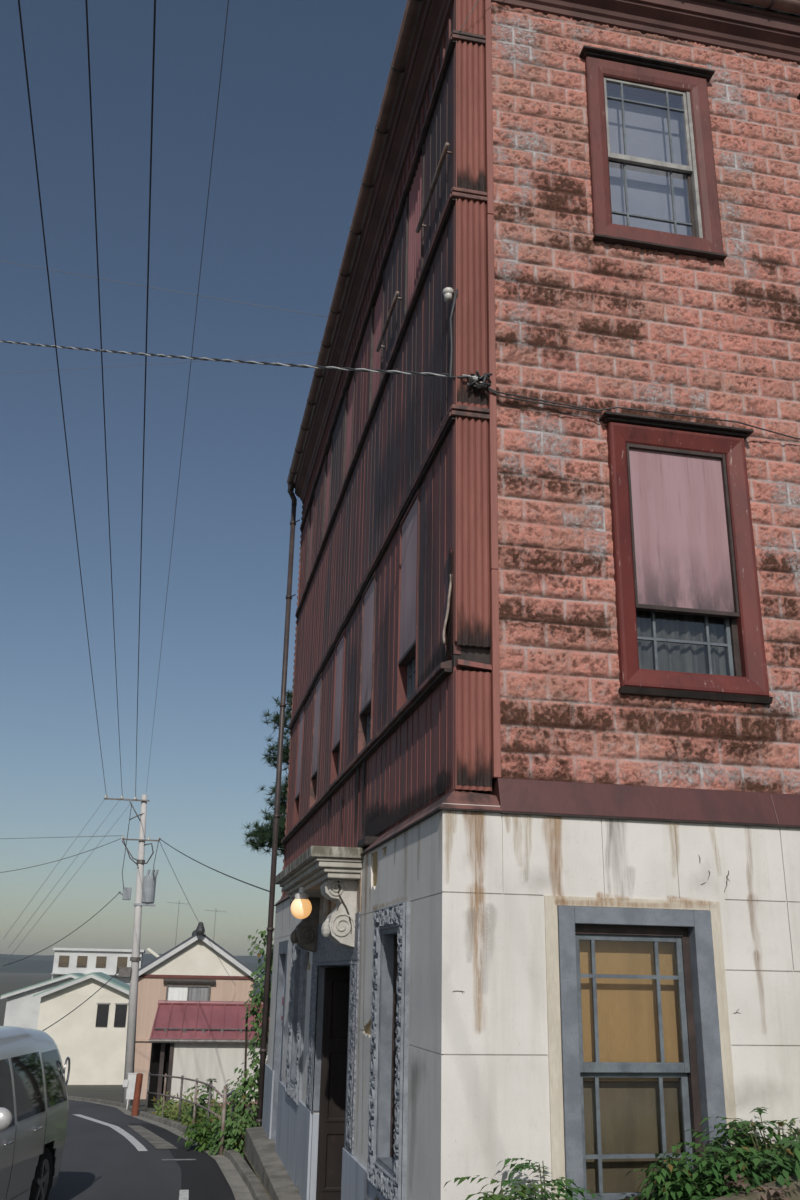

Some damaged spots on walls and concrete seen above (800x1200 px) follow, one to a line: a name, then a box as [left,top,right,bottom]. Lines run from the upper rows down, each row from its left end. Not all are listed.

leakage [494,200,536,222]
leakage [543,229,643,282]
leakage [753,253,789,274]
leakage [504,282,561,307]
leakage [775,313,800,330]
leakage [522,318,645,360]
leakage [501,739,569,765]
leakage [666,734,765,773]
leakage [738,778,783,793]
rust [447,810,484,848]
spalling [373,847,387,886]